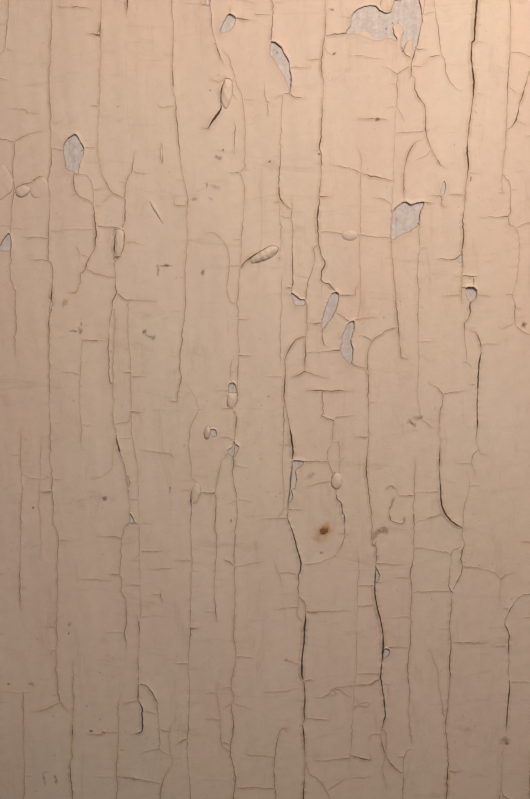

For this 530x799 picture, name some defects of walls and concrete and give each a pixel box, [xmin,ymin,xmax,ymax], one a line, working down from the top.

peeling [343,0,426,57]
peeling [266,38,296,91]
peeling [60,130,88,177]
peeling [387,198,427,243]
peeling [318,288,358,367]
crack [0,0,229,799]
crack [184,0,530,799]